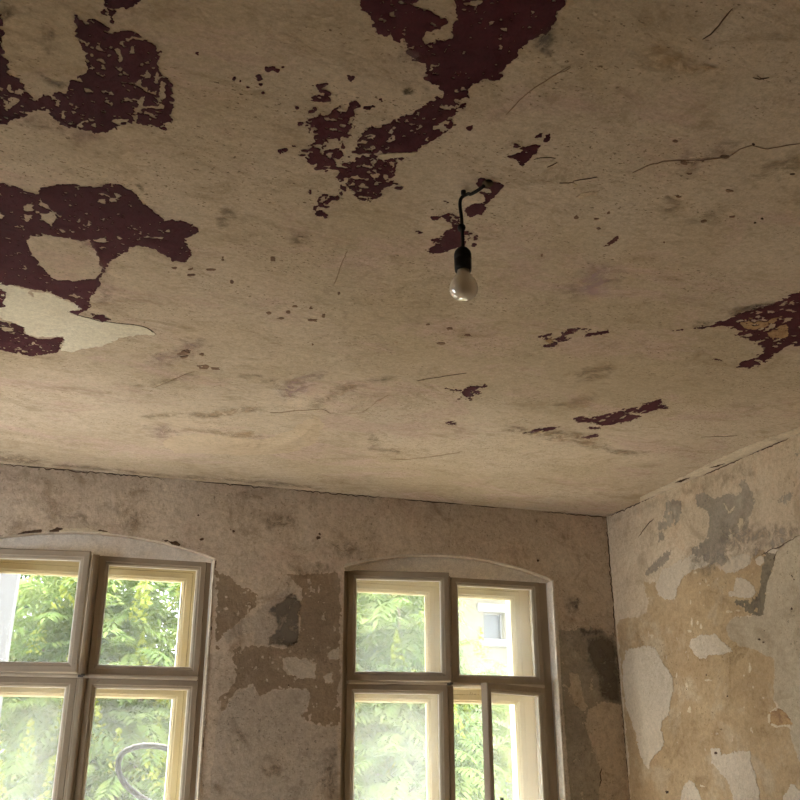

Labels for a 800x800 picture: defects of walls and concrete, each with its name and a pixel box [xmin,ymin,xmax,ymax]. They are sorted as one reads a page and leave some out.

peeling [0,0,175,134]
peeling [278,0,566,219]
crack [633,143,800,173]
peeling [427,178,504,254]
peeling [0,183,199,357]
peeling [538,328,609,348]
peeling [694,291,800,369]
peeling [573,399,668,439]
peeling [211,561,258,650]
peeling [219,571,342,727]
damp [581,628,619,701]
peeling [559,479,800,800]